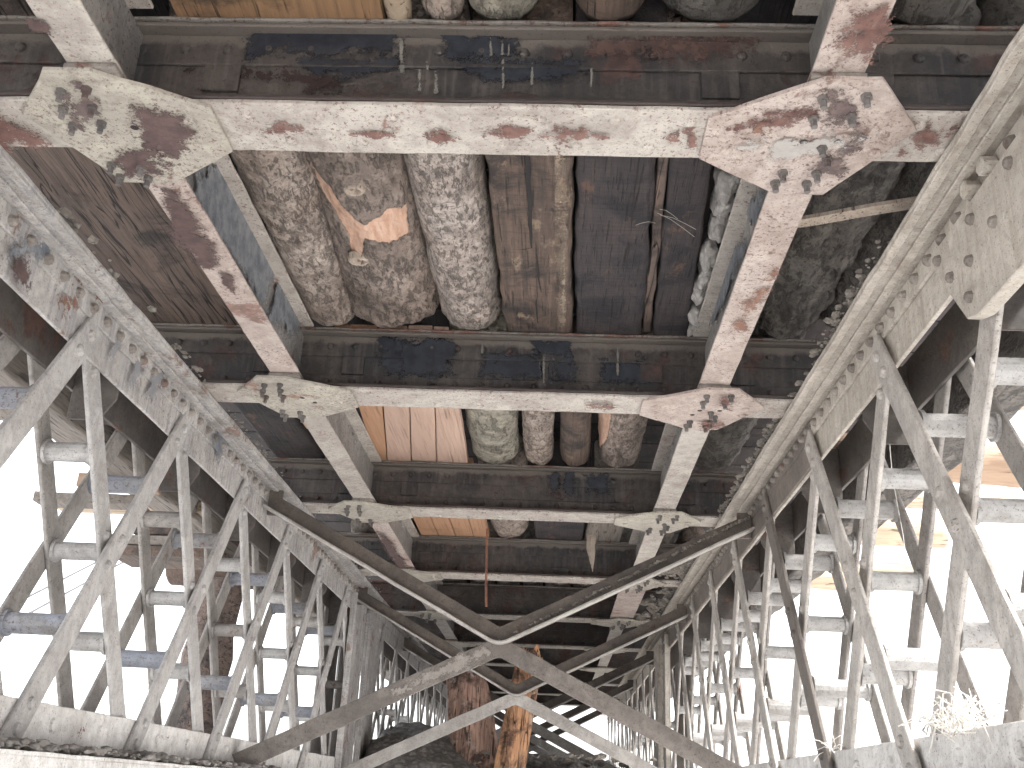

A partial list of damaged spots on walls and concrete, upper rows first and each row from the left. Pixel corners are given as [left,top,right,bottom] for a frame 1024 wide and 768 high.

corrosion [827,4,895,65]
peeling [440,35,588,83]
corrosion [0,95,54,153]
corrosion [344,130,397,140]
corrosion [421,129,462,145]
corrosion [482,125,610,156]
corrosion [726,88,871,180]
corrosion [895,124,960,157]
corrosion [112,103,236,295]
peeling [376,336,458,380]
peeling [531,340,580,384]
peeling [597,356,650,385]